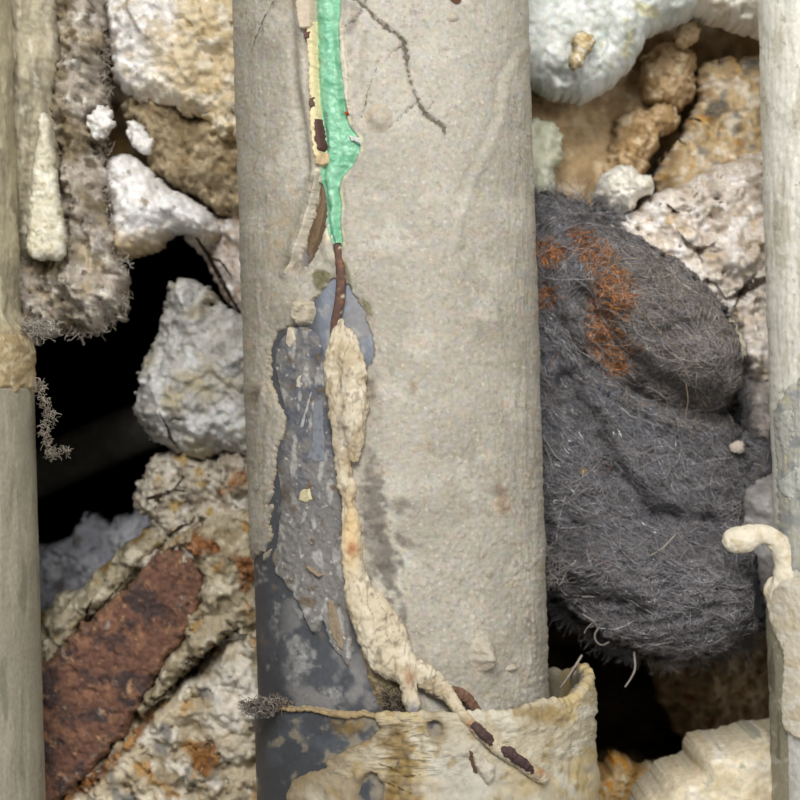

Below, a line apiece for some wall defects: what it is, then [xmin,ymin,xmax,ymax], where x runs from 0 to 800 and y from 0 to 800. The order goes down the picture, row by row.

crack [345,0,446,133]
peeling [272,300,352,668]